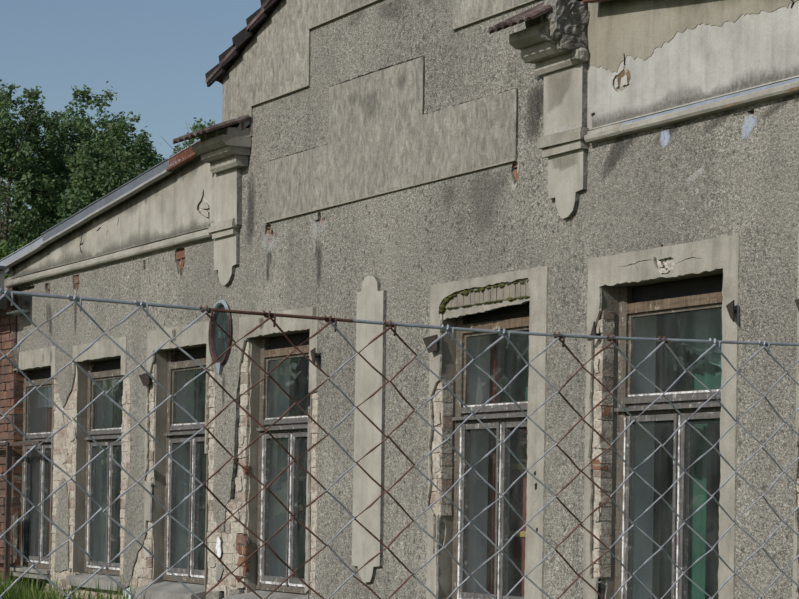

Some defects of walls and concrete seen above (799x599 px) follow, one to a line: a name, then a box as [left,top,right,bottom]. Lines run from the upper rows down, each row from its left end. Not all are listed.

peeling [587,0,799,130]
flaking render [45,370,154,599]
flaking render [146,363,156,483]
flaking render [206,341,251,598]
flaking render [310,391,318,595]
flaking render [430,380,453,550]
flaking render [592,311,615,579]